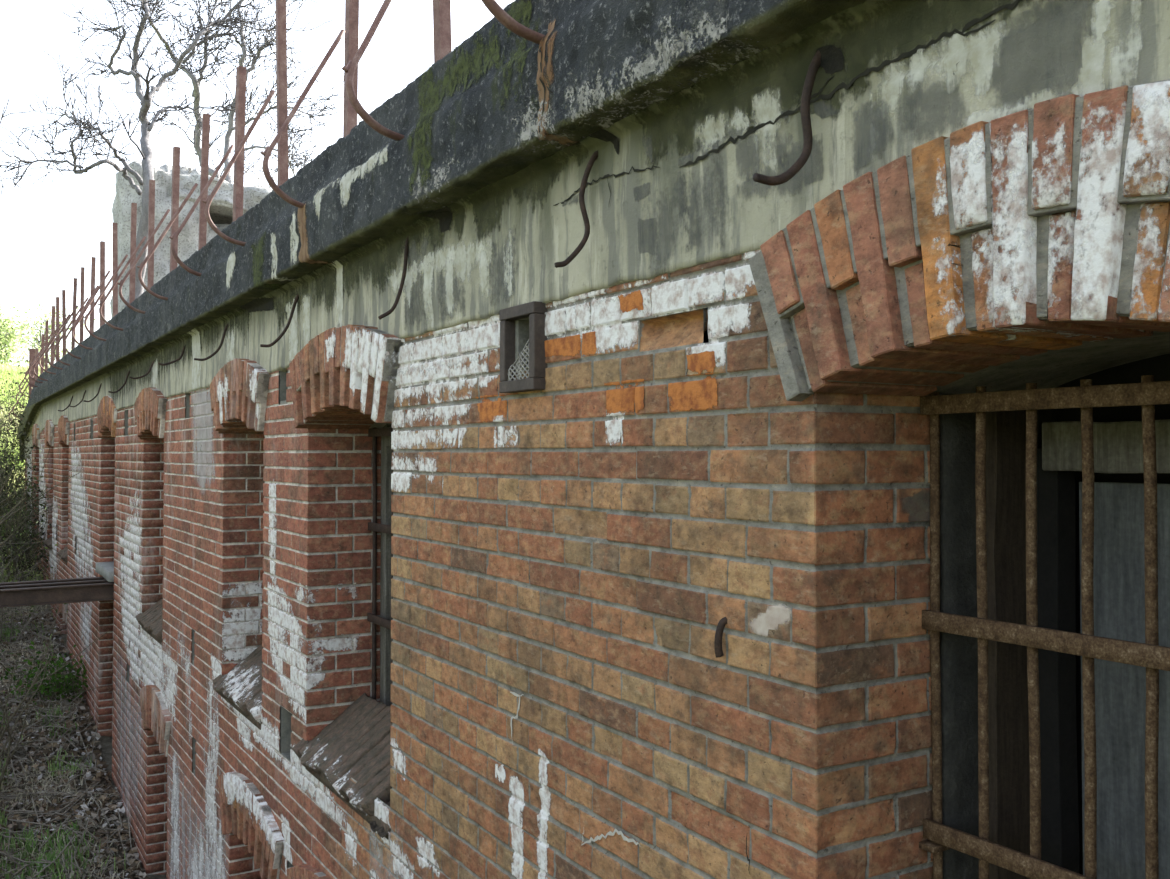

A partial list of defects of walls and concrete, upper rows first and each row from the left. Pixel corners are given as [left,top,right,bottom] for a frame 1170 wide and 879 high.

corrosion [536,19,581,146]
crack [553,0,1020,206]
leakage [226,251,236,287]
leakage [270,142,588,361]